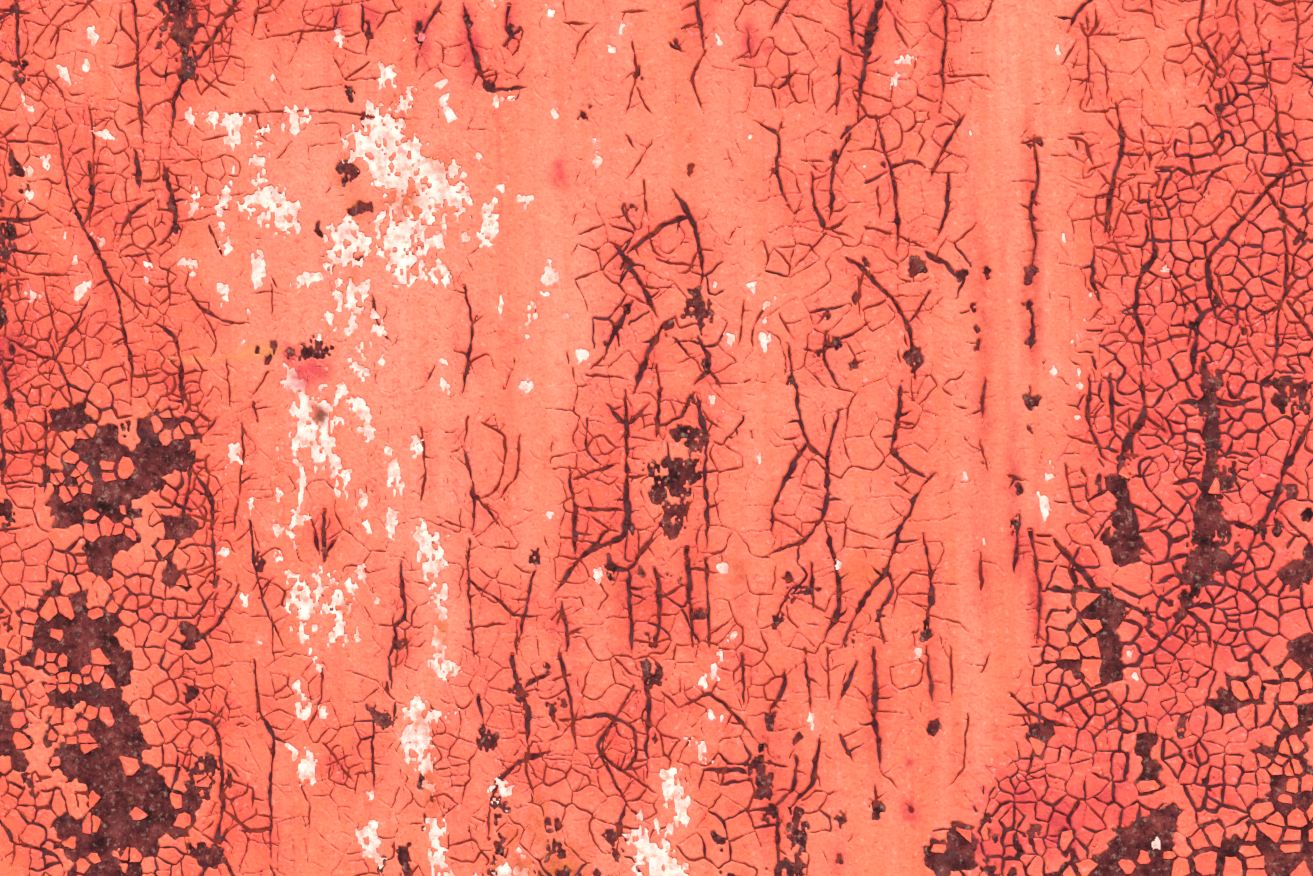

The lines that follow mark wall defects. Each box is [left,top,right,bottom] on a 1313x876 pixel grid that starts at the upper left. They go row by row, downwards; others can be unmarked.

peeling [185,105,312,256]
peeling [272,61,534,681]
crack [0,0,1027,876]
rust [643,425,710,540]
rust [1168,367,1313,625]
rust [0,399,232,876]
rust [1057,584,1154,694]
peeling [399,694,460,796]
peeling [622,763,690,876]
crack [1008,685,1161,853]
rust [923,633,1313,876]
crack [1191,760,1265,815]